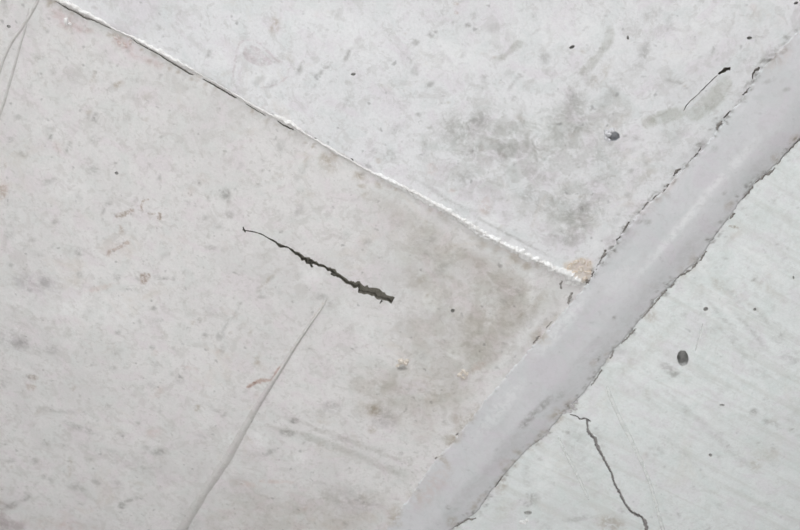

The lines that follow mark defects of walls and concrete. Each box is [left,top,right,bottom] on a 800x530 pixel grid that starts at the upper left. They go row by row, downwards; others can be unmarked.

crack [242,227,395,304]
crack [570,414,648,530]